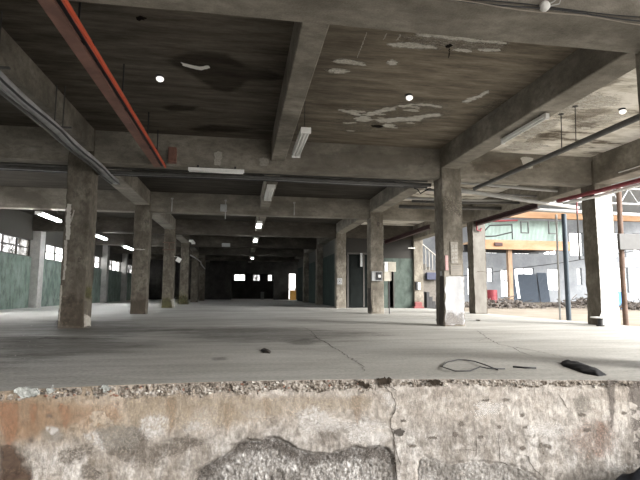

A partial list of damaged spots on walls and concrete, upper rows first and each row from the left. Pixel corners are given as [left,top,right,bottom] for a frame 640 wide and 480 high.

peeling [329,59,366,73]
peeling [339,102,445,132]
spalling [0,379,640,401]
crack [382,384,405,479]
flaking render [198,437,395,480]